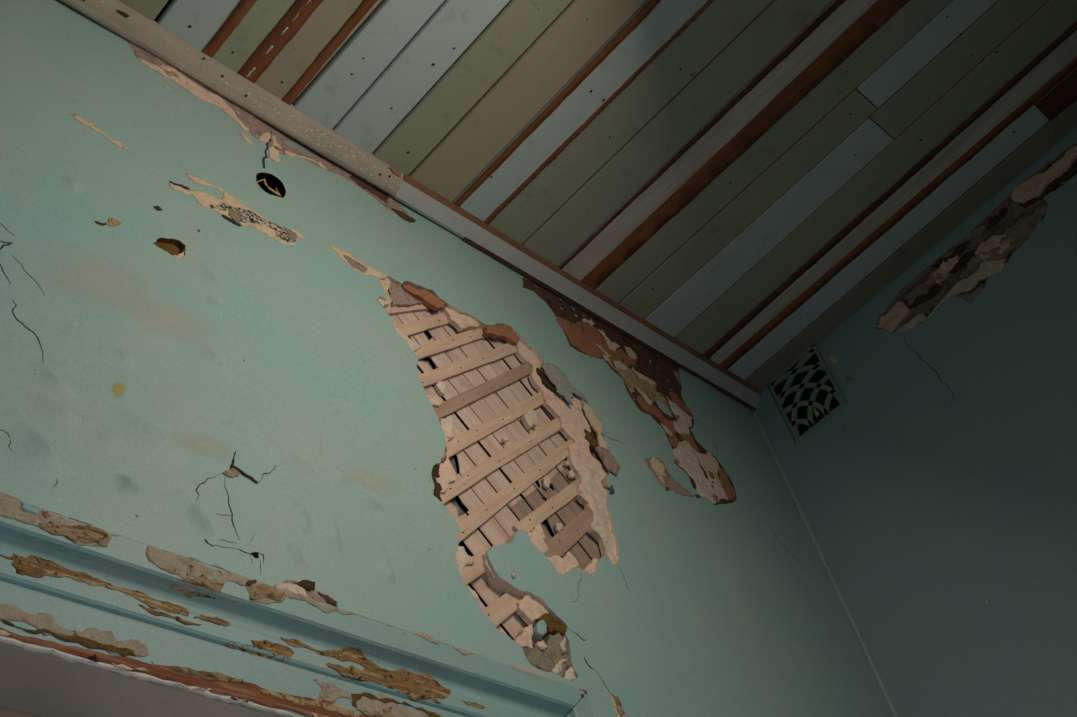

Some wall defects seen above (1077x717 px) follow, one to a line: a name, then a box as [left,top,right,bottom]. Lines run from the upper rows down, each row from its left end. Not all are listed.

peeling [136,57,328,170]
crack [0,223,44,362]
spalling [155,242,182,255]
peeling [169,173,304,246]
spalling [876,142,1077,334]
peeling [522,278,737,505]
peeling [0,492,121,547]
crack [196,451,277,574]
spalling [327,244,621,698]
peeling [0,603,149,672]
peeling [0,545,481,656]
peeling [223,636,486,717]